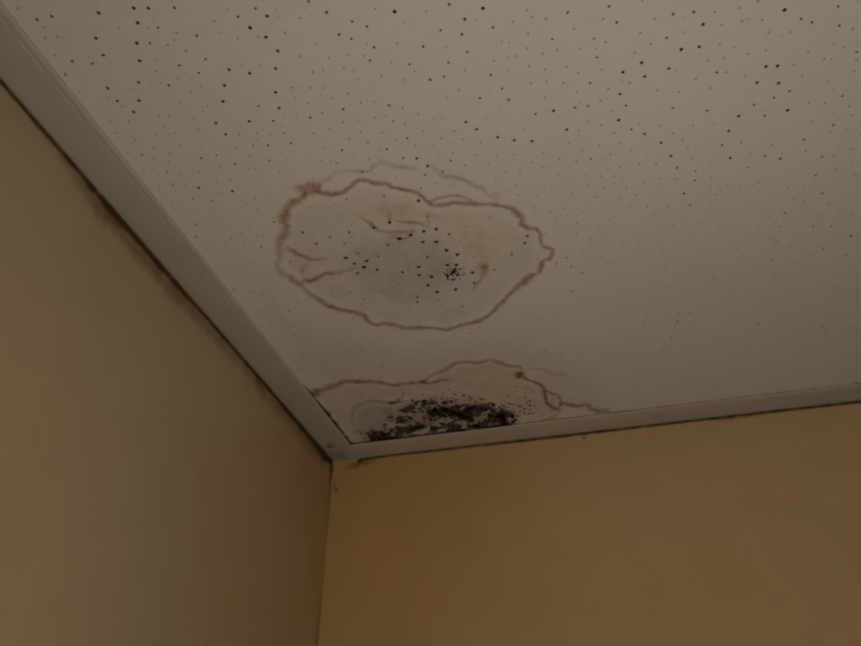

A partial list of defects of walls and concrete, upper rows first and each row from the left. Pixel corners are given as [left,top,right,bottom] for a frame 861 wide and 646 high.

leakage [387,228,475,301]
leakage [312,373,556,445]